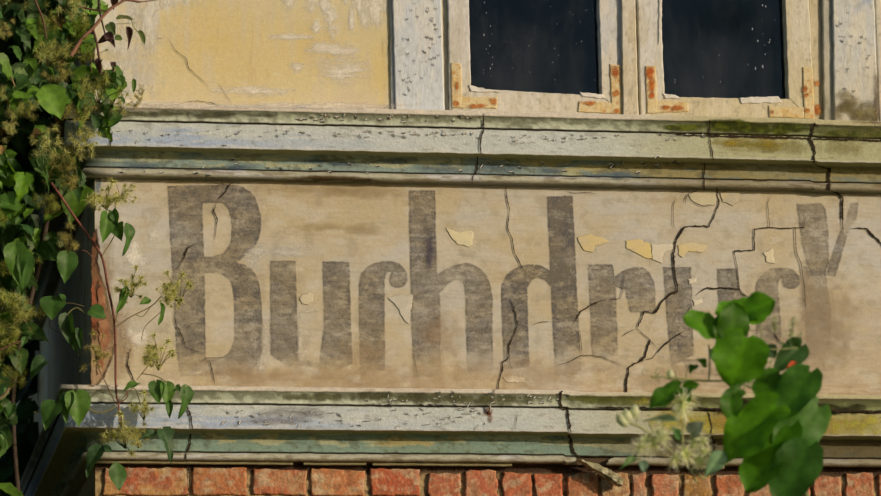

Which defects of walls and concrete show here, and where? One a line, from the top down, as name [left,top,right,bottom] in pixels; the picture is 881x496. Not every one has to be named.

peeling [120,3,159,60]
peeling [272,0,367,80]
peeling [122,70,480,139]
crack [472,113,485,181]
corrosion [647,68,655,98]
damp [665,119,809,152]
damp [819,77,881,152]
spalling [626,239,708,264]
crack [554,120,881,457]
crack [493,300,550,404]
damp [567,395,650,405]
damp [818,403,878,433]